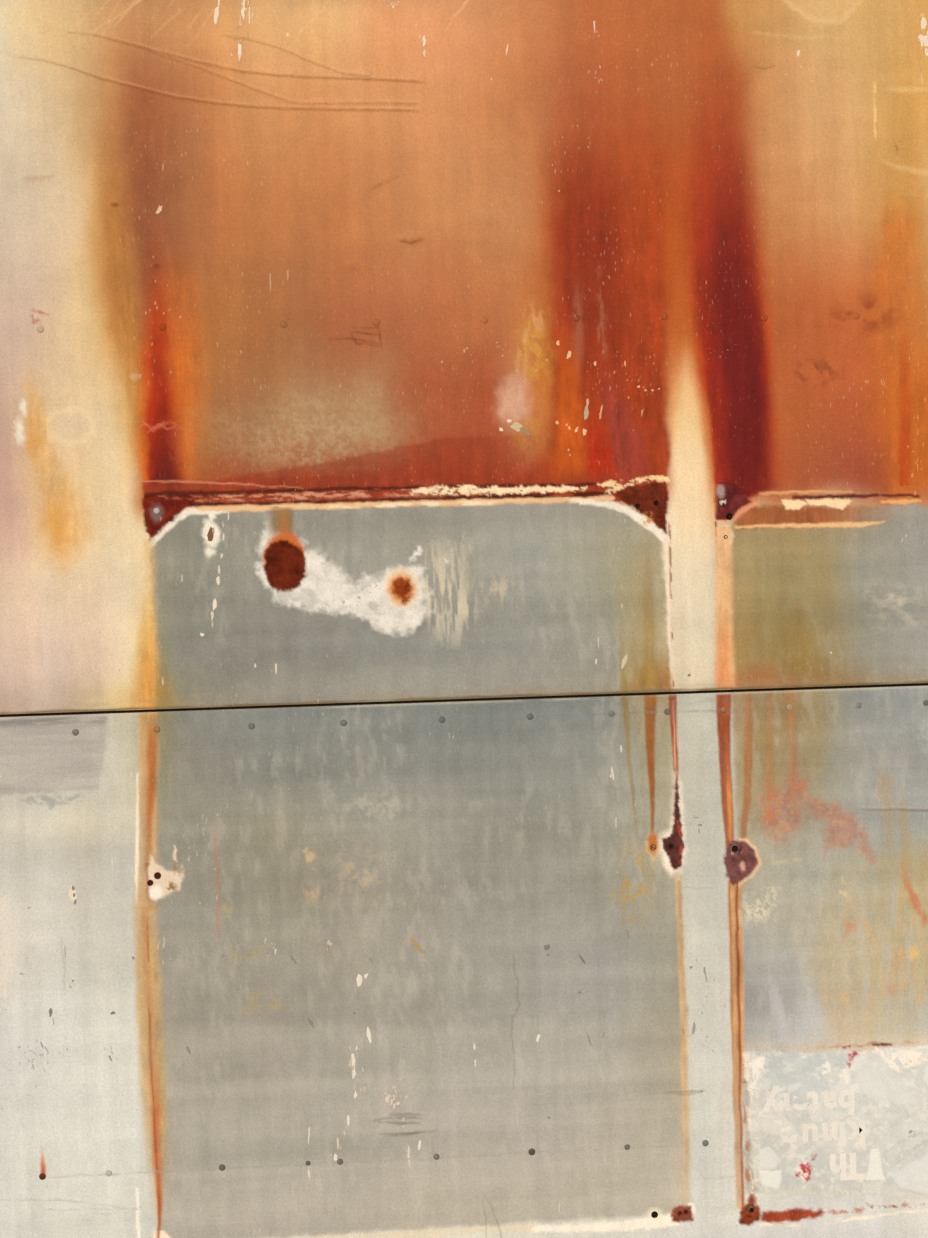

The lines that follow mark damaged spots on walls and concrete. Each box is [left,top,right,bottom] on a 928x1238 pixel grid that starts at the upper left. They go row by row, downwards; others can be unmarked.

corrosion [98,16,928,706]
corrosion [130,712,179,1238]
peeling [0,396,928,1238]
corrosion [620,697,695,1225]
corrosion [714,694,928,1229]